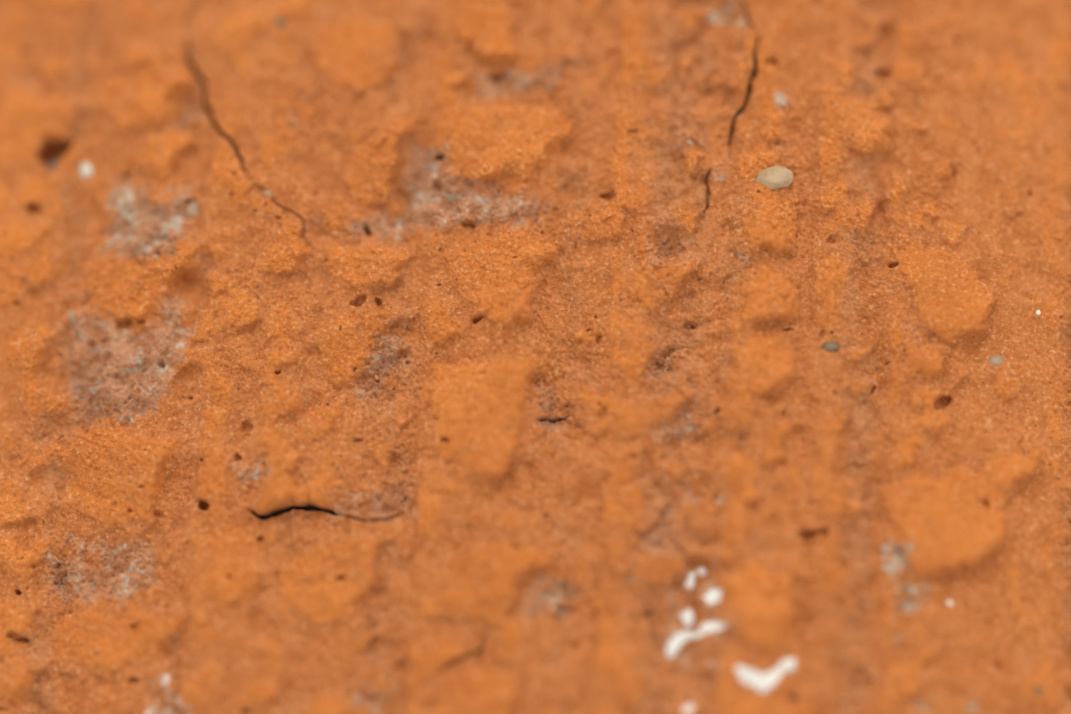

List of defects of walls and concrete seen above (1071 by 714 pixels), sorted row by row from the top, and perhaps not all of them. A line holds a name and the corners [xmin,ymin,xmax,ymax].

crack [182,0,316,251]
crack [703,0,761,217]
crack [247,501,405,524]